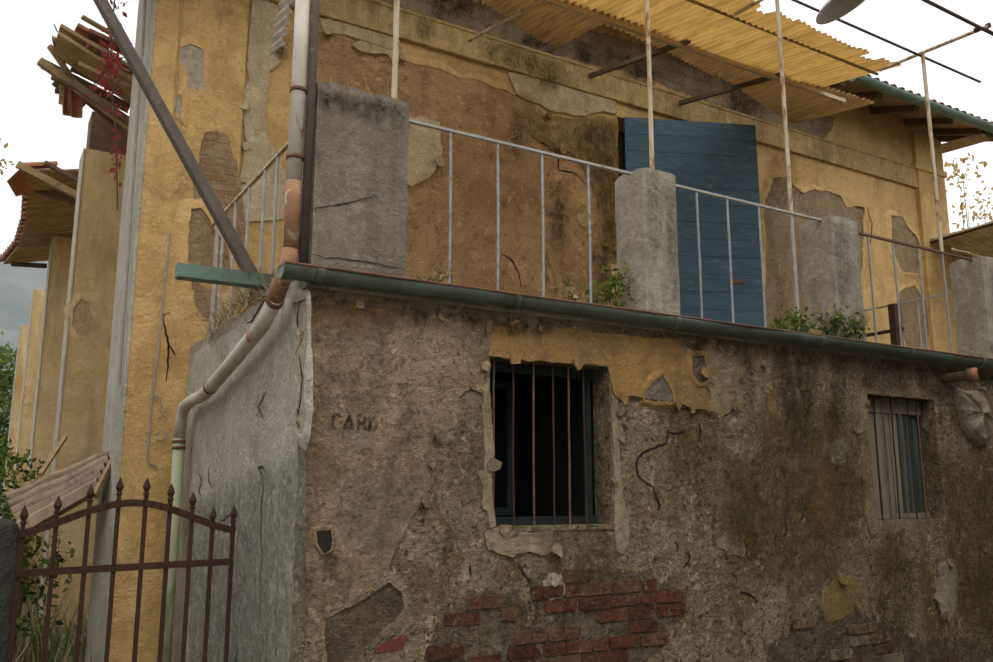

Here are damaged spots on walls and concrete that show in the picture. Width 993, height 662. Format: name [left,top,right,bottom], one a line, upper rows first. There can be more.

crack [159,311,175,382]
flaking render [175,184,238,270]
peeling [198,0,288,247]
crack [315,196,376,209]
crack [313,254,409,272]
flaking render [306,19,619,306]
flaking render [382,0,837,141]
flaking render [759,169,868,330]
flaking render [884,209,930,349]
peeling [291,289,746,662]
crack [628,396,719,514]
leakage [682,353,865,584]